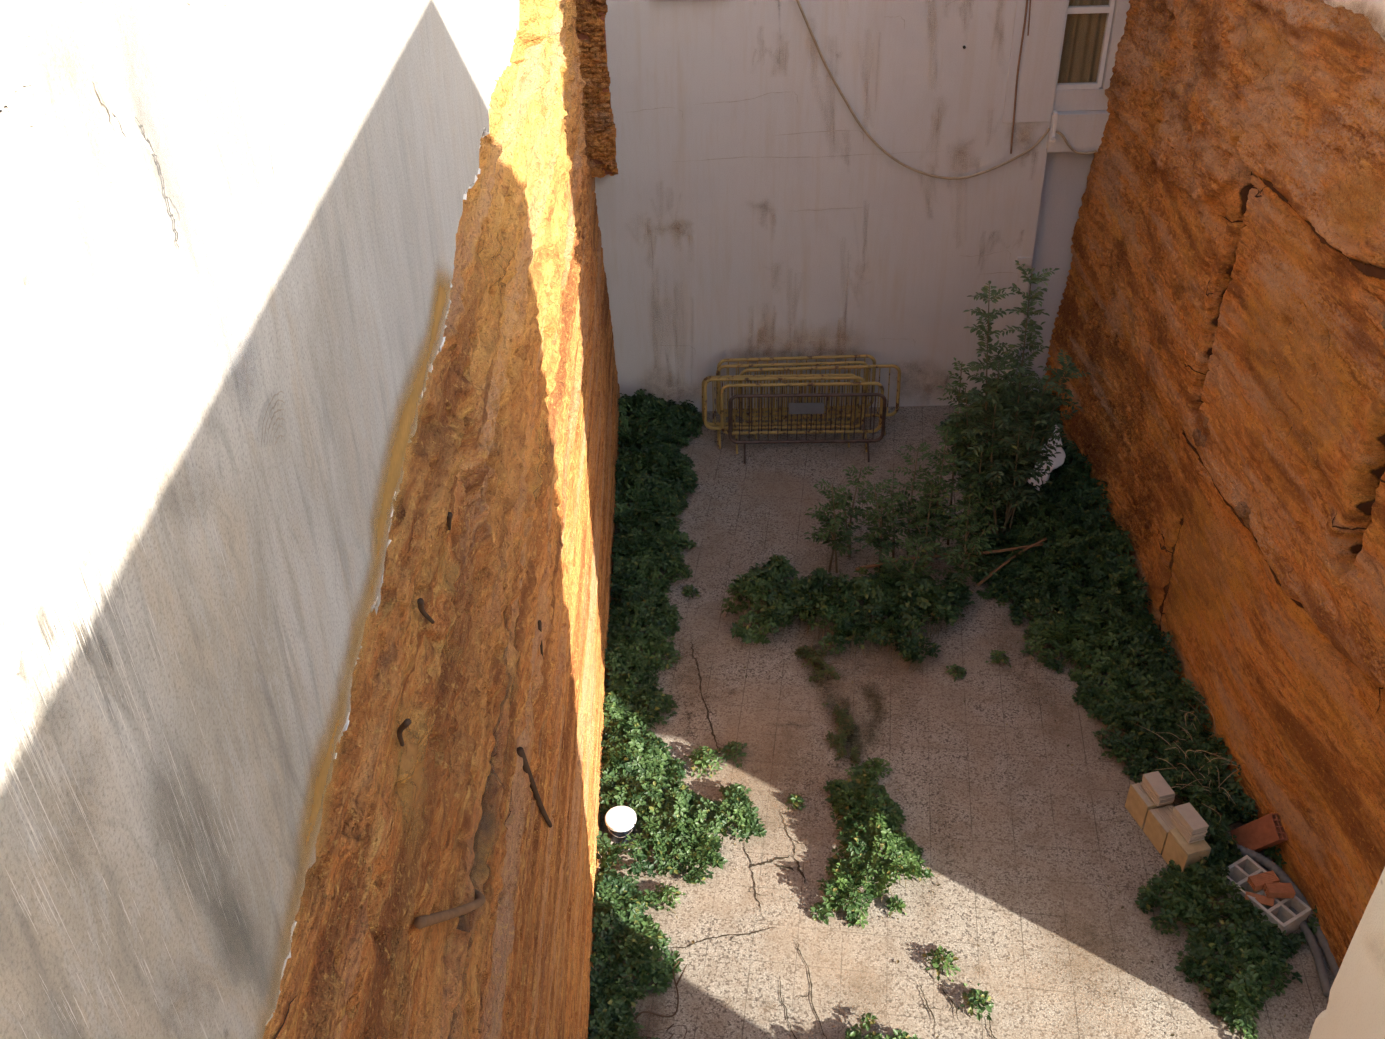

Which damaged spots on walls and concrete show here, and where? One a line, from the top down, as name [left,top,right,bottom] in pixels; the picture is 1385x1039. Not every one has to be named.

crack [1182,172,1385,609]
crack [690,642,719,751]
crack [669,808,827,1039]
crack [918,981,997,1039]